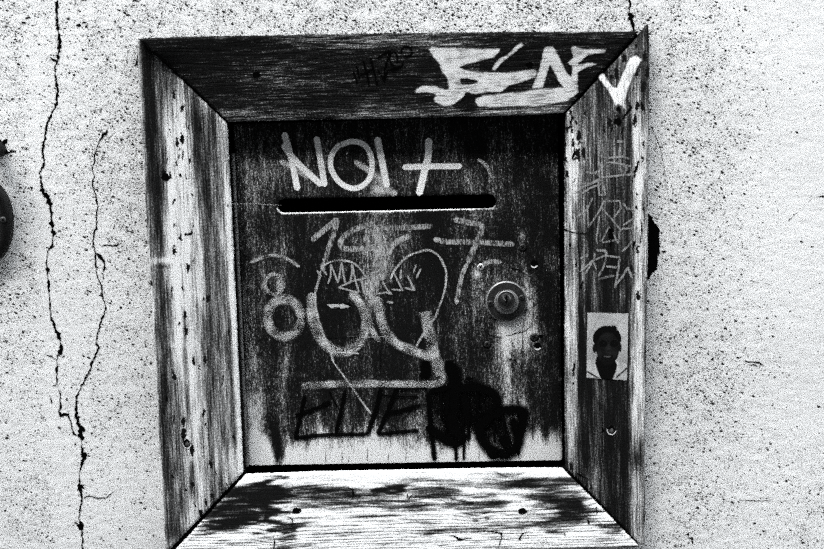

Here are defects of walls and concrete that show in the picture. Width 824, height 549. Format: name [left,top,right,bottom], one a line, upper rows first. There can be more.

crack [39,0,120,549]
crack [627,0,635,31]